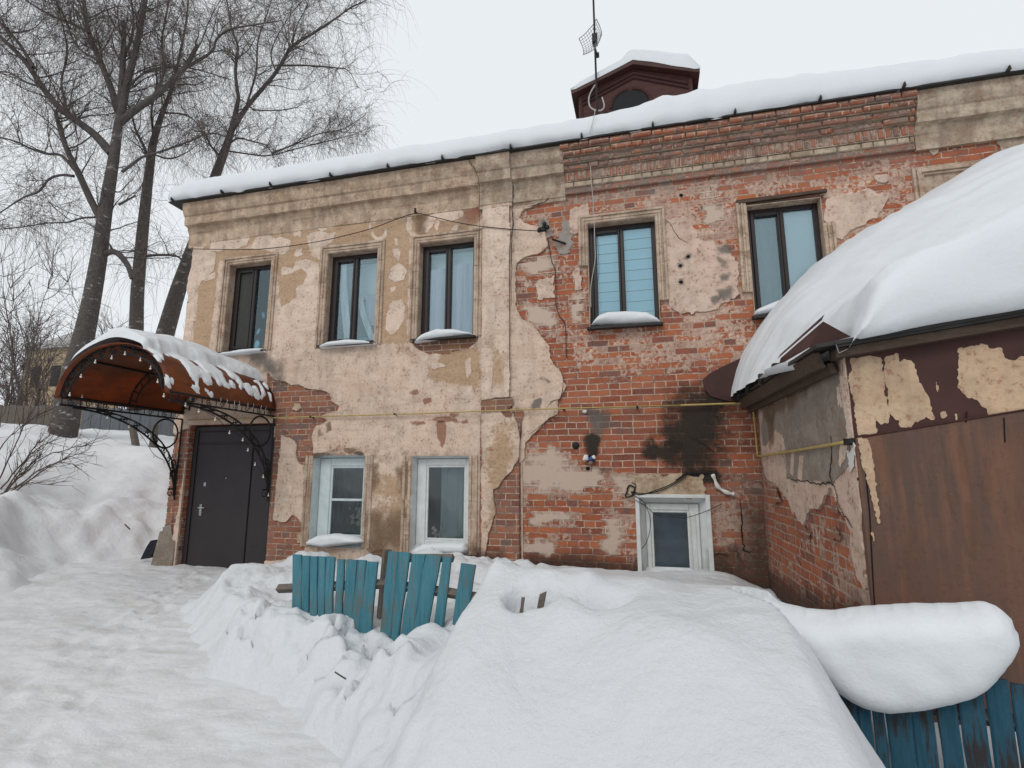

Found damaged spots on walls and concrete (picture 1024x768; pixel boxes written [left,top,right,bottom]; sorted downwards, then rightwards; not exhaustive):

peeling [369,210,464,335]
peeling [486,206,511,325]
peeling [535,275,555,300]
peeling [569,203,590,234]
peeling [665,216,740,315]
flaking render [185,228,363,561]
leakage [520,409,634,570]
peeling [627,473,706,499]
leakage [642,387,731,483]
crack [715,499,756,556]
peeling [836,353,958,541]
peeling [957,344,1024,415]